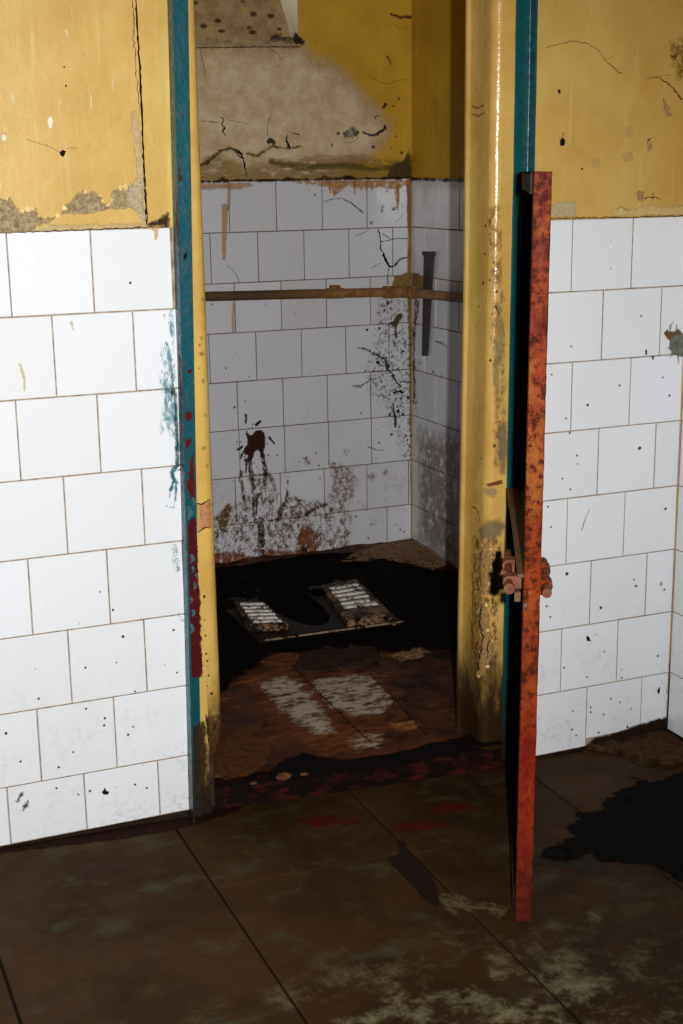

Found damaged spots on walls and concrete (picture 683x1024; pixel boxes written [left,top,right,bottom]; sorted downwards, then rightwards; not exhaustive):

crack [209,117,247,177]
peeling [196,45,387,181]
crack [363,115,386,148]
crack [546,41,683,100]
flaking render [0,176,147,232]
crack [325,198,408,285]
water stain [218,414,289,556]
flaking render [471,521,504,684]
water stain [533,769,683,881]